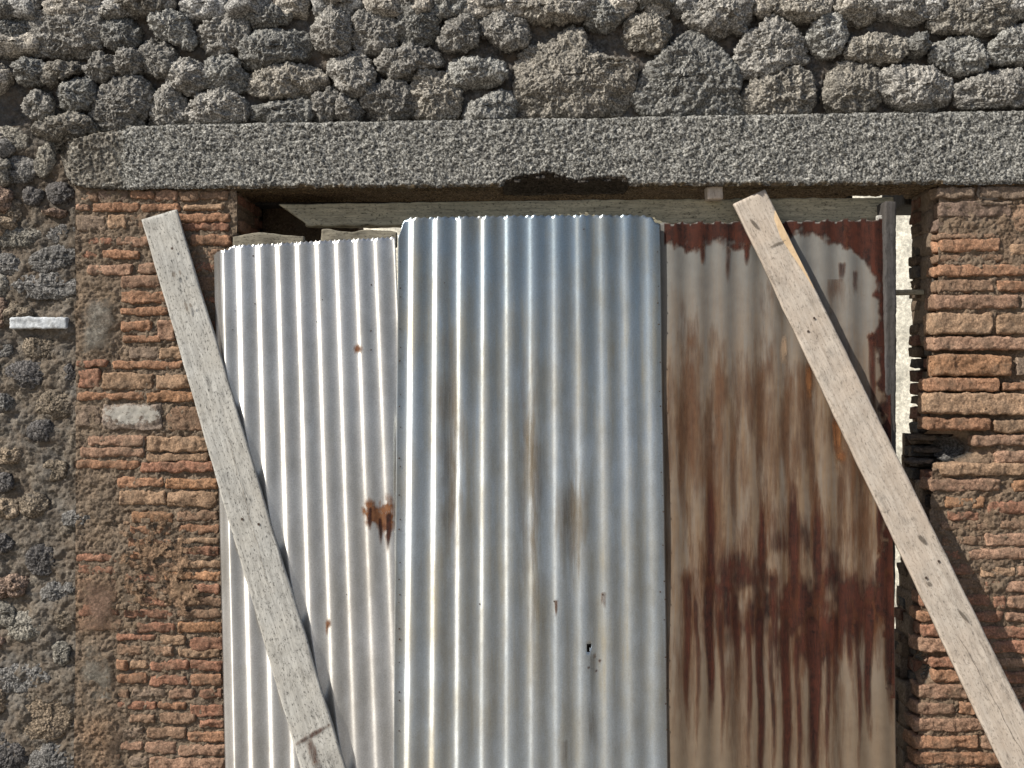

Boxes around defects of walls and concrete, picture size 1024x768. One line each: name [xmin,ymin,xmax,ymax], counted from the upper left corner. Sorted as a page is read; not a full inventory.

rust [664,221,751,272]
rust [782,218,891,442]
rust [363,499,394,545]
rust [666,334,895,768]